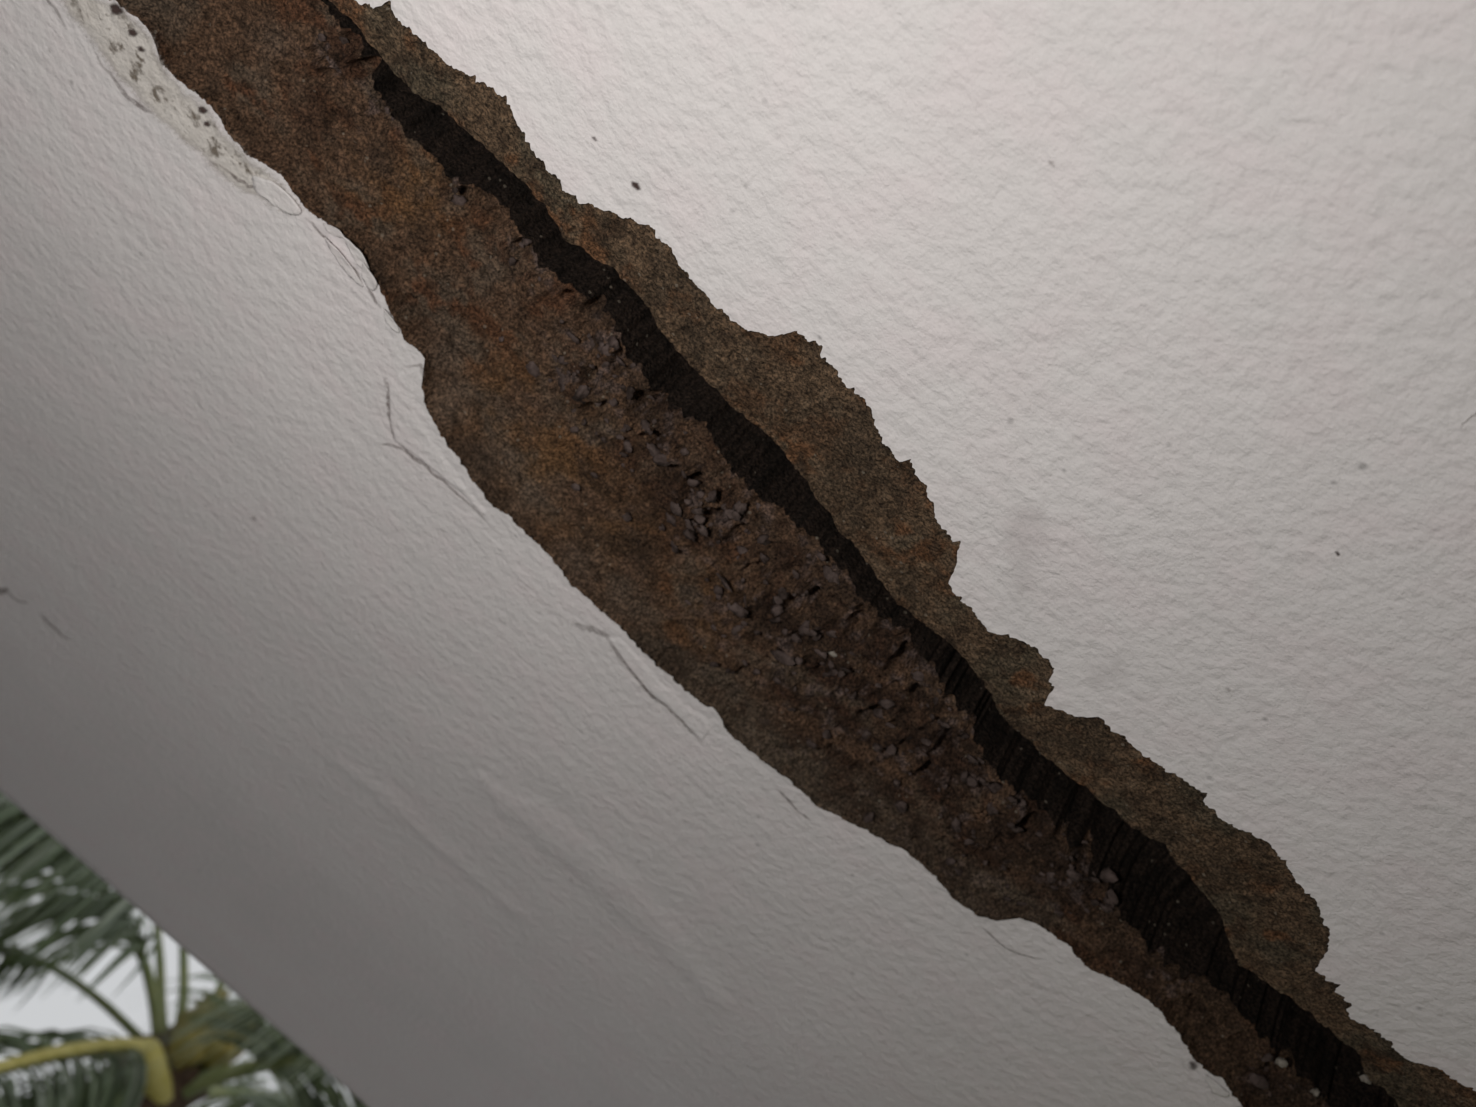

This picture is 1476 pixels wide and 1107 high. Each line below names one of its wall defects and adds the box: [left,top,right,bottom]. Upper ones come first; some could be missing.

peeling [64,0,301,215]
spalling [321,0,1476,1107]